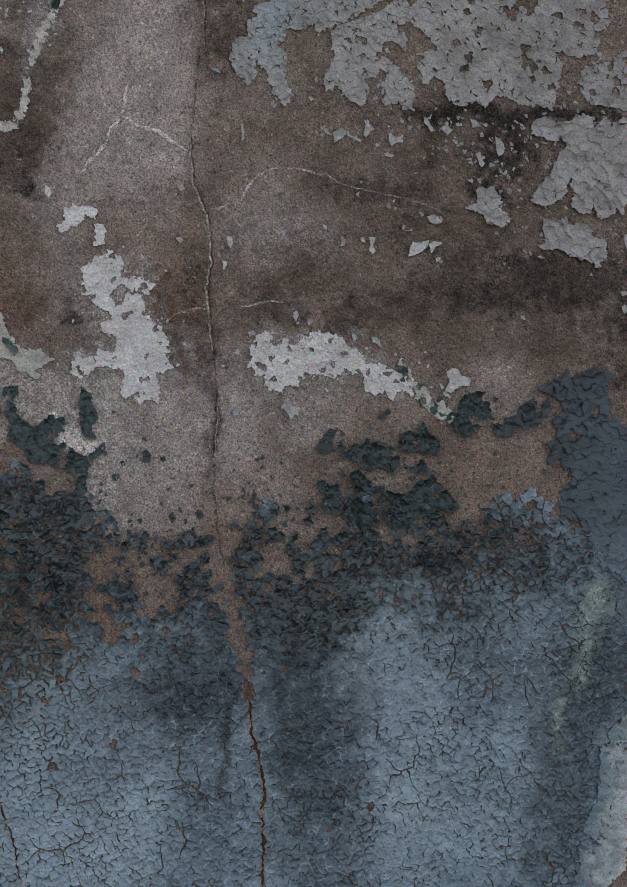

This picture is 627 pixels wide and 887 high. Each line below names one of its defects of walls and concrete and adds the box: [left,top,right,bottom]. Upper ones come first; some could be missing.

peeling [0,0,66,132]
peeling [229,0,627,268]
crack [81,83,399,557]
peeling [0,203,627,887]
crack [0,802,20,879]
crack [243,684,266,887]